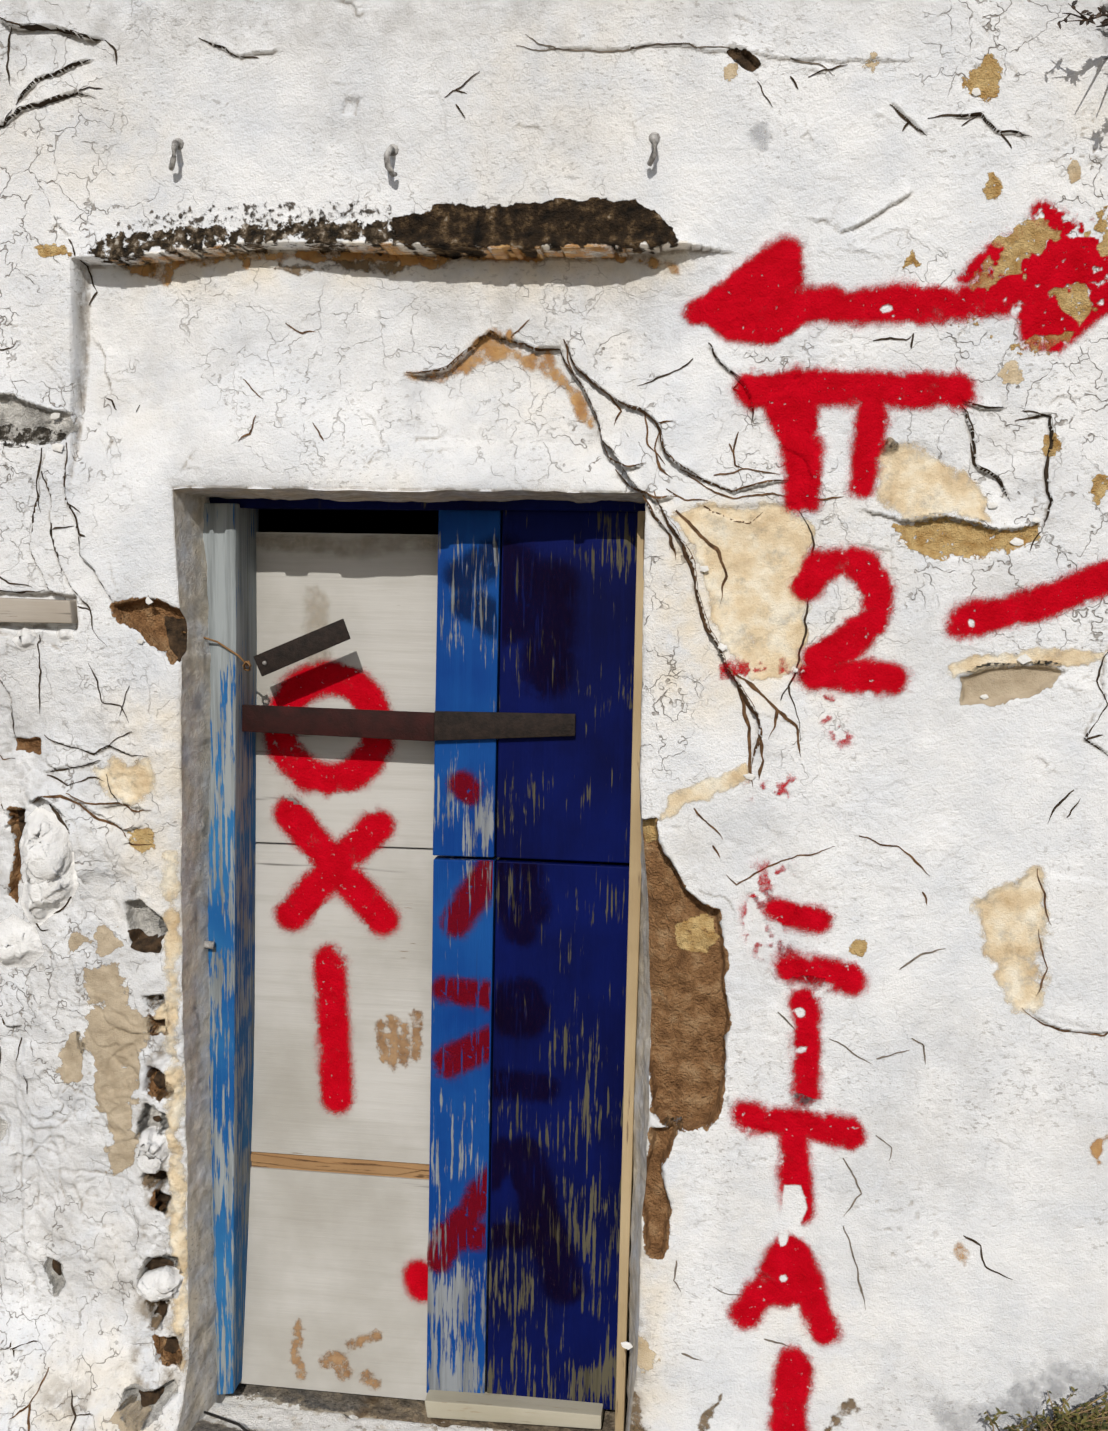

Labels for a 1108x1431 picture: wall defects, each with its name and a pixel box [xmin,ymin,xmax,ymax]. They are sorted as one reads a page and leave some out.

crack [0,17,117,128]
crack [516,35,732,53]
crack [757,57,848,106]
spalling [0,393,79,452]
crack [407,319,844,787]
flaking render [877,437,1041,561]
crack [0,442,151,846]
spalling [109,596,187,665]
spalling [7,806,26,903]
crack [36,897,72,931]
flaking render [55,900,174,1213]
spalling [642,763,756,1260]